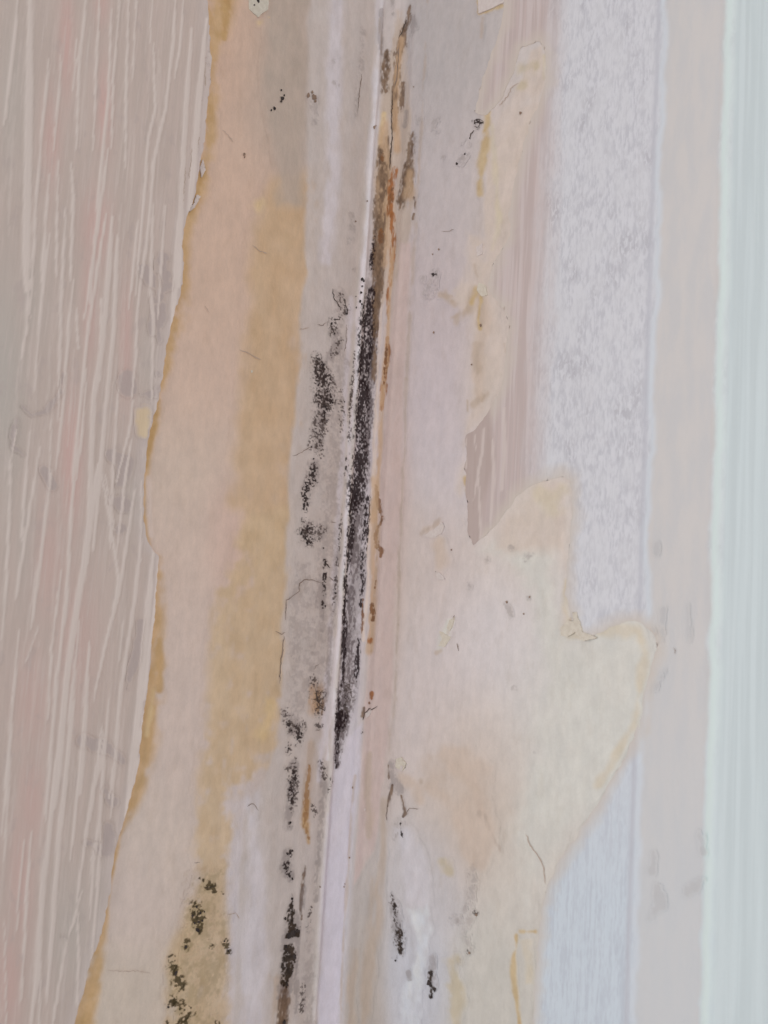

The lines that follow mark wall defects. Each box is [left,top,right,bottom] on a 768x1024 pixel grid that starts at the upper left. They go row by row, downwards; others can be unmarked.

leakage [75,0,244,1024]
leakage [159,0,441,1024]
rust [360,8,419,657]